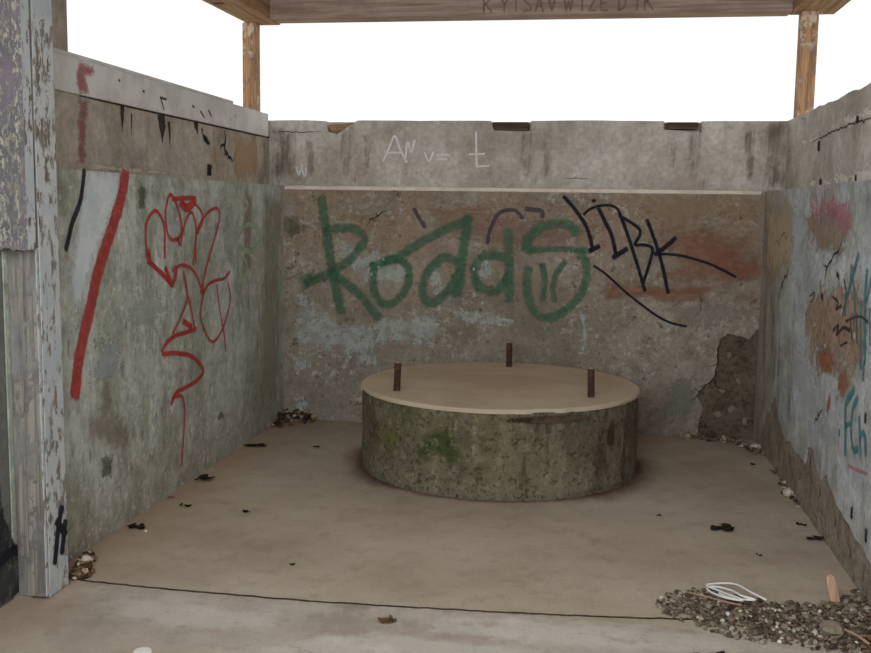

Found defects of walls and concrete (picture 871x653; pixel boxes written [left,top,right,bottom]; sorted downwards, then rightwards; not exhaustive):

crack [809,117,871,154]
spalling [697,330,871,606]